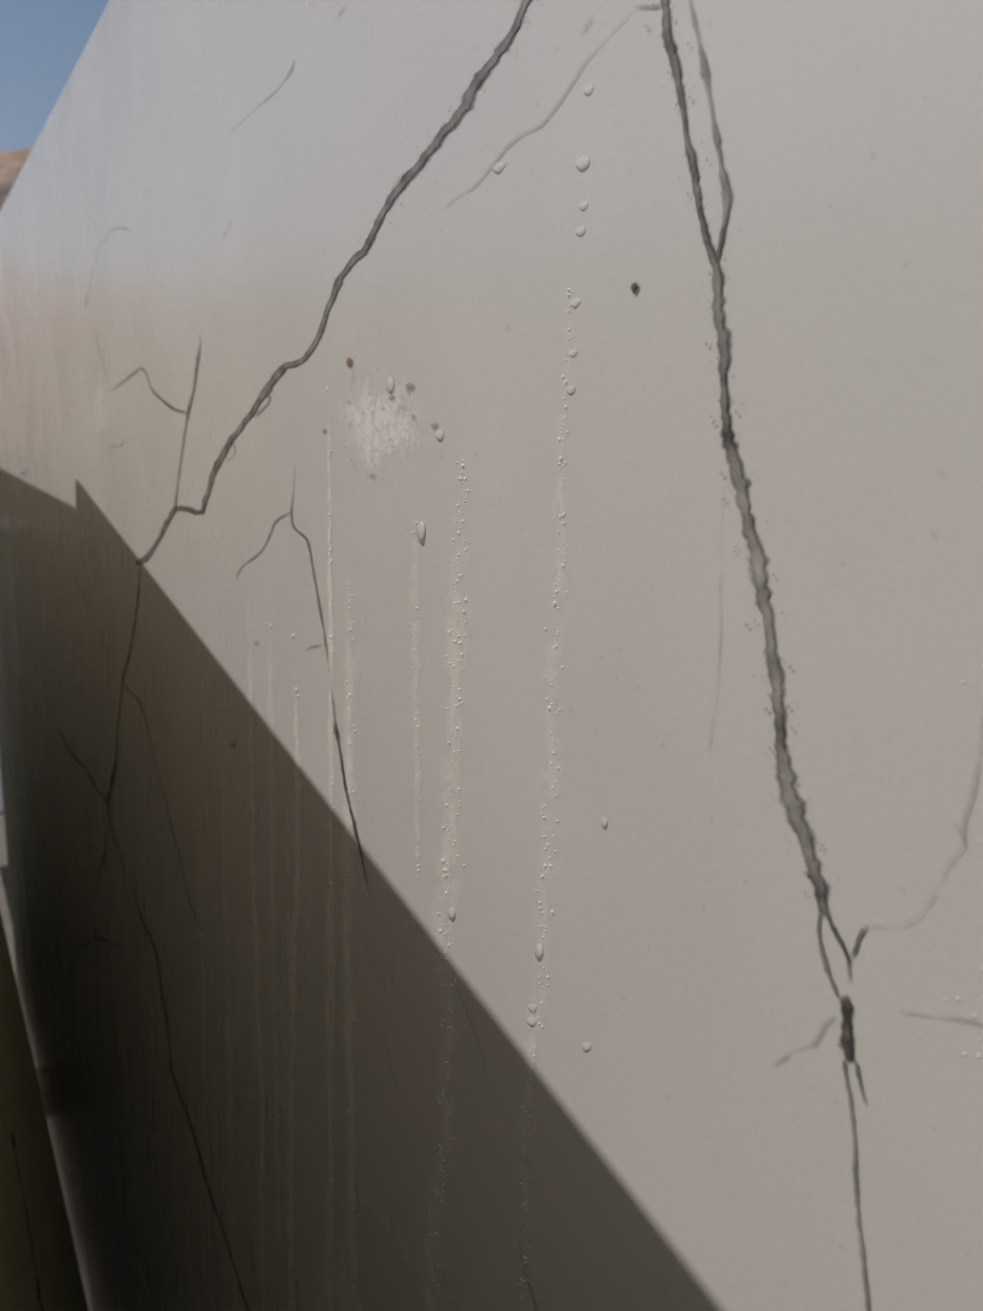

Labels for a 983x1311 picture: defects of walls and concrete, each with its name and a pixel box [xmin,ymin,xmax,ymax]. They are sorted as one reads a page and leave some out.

crack [59,0,538,1311]
crack [641,0,869,1311]